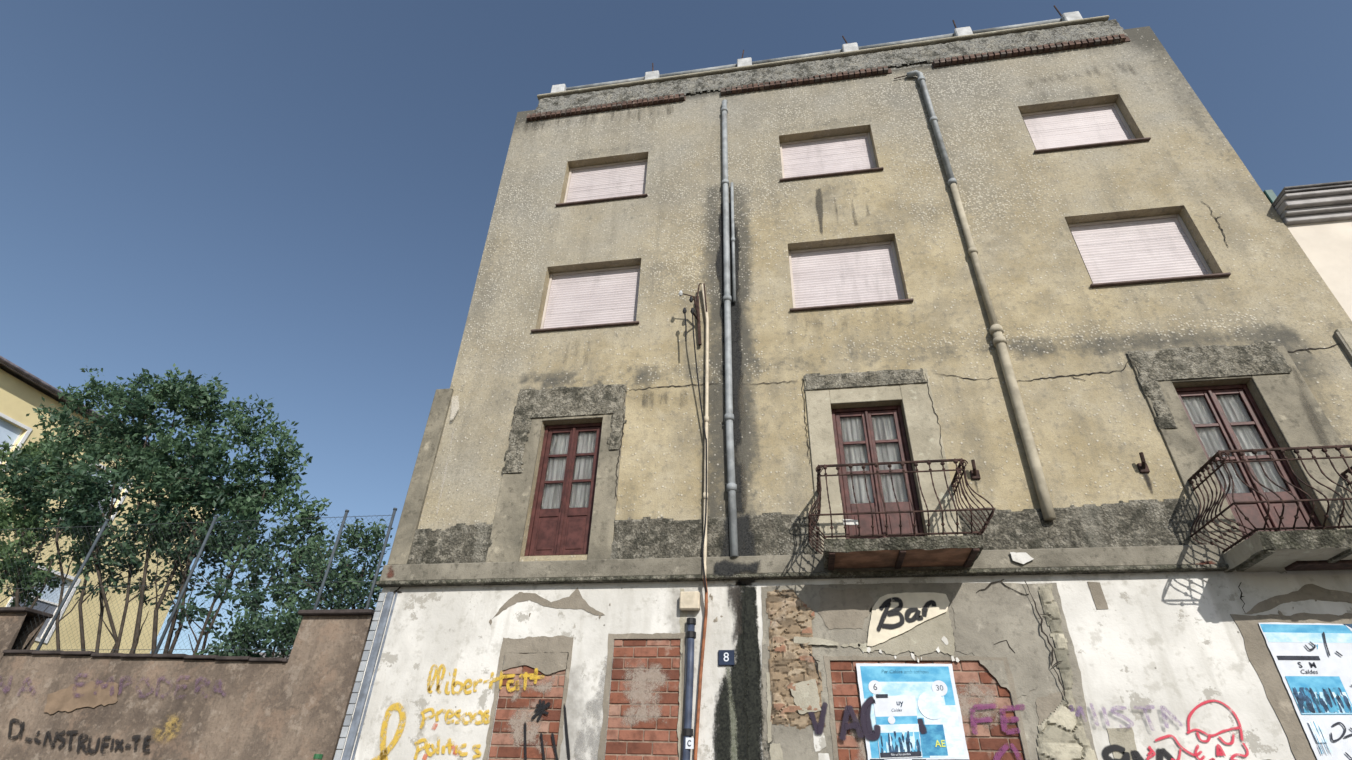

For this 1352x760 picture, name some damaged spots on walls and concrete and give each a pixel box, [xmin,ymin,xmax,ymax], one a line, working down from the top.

leakage [816,189,837,234]
crack [1287,344,1340,353]
crack [925,361,1128,457]
leakage [713,202,771,760]
flaking render [1010,552,1034,565]
flaking render [485,587,611,630]
flaking render [1233,584,1352,623]
peeling [677,589,688,760]
flaking render [760,583,1098,760]